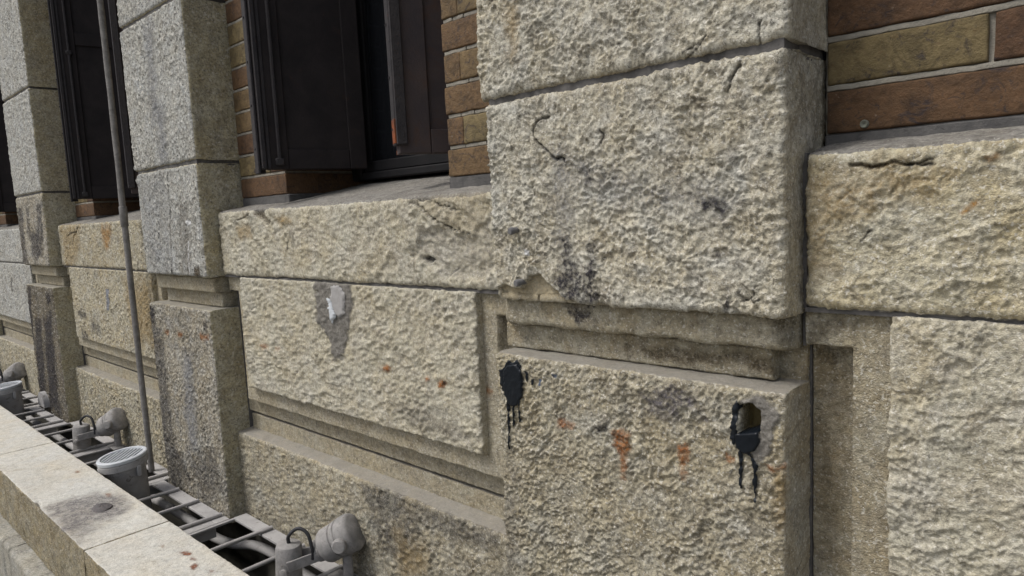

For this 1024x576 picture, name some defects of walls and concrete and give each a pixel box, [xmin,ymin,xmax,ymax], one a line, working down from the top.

crack [838,158,932,201]
leakage [554,236,599,323]
peeling [326,285,345,323]